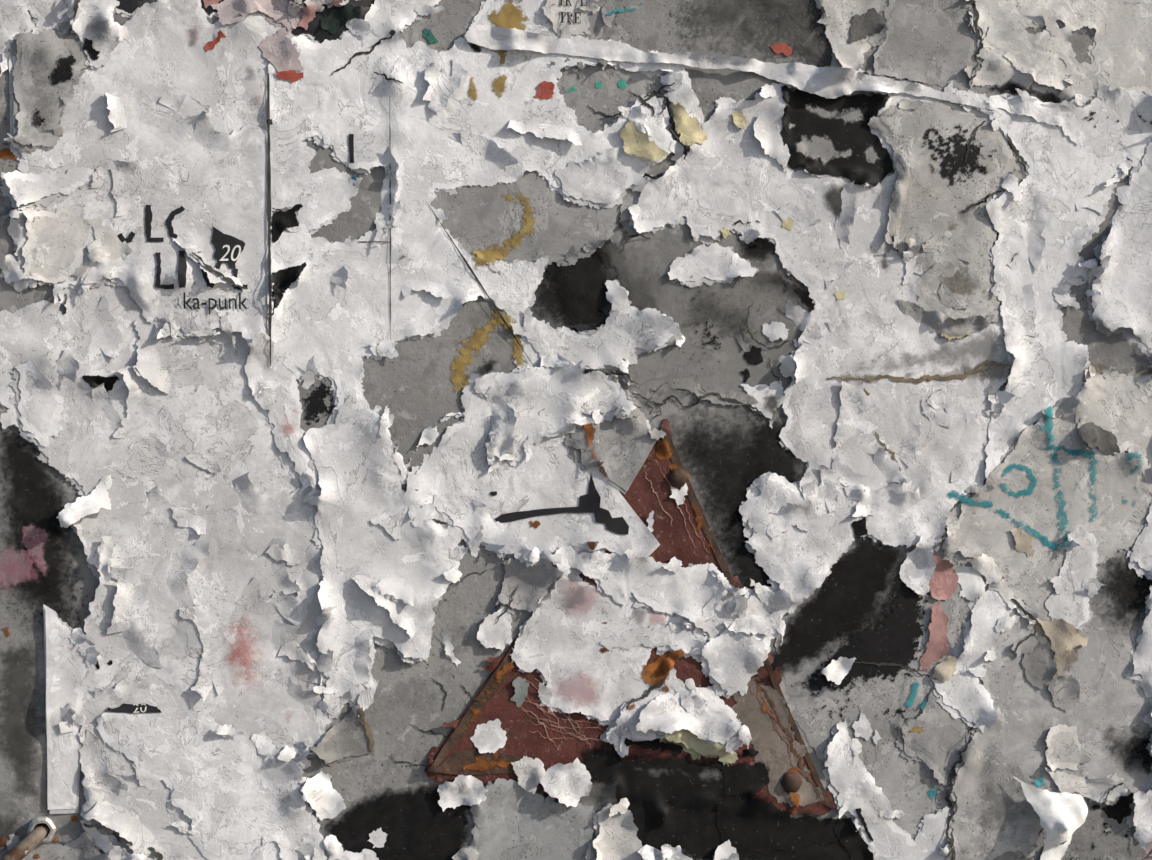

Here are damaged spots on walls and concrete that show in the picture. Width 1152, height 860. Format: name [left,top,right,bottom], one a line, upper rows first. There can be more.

crack [971,0,983,84]
crack [331,30,403,339]
crack [426,201,537,370]
rust [584,423,607,477]
rust [469,662,514,725]
rust [642,649,684,692]
crack [855,661,930,677]
rust [463,750,512,772]
rust [789,792,800,816]
crack [945,723,975,860]